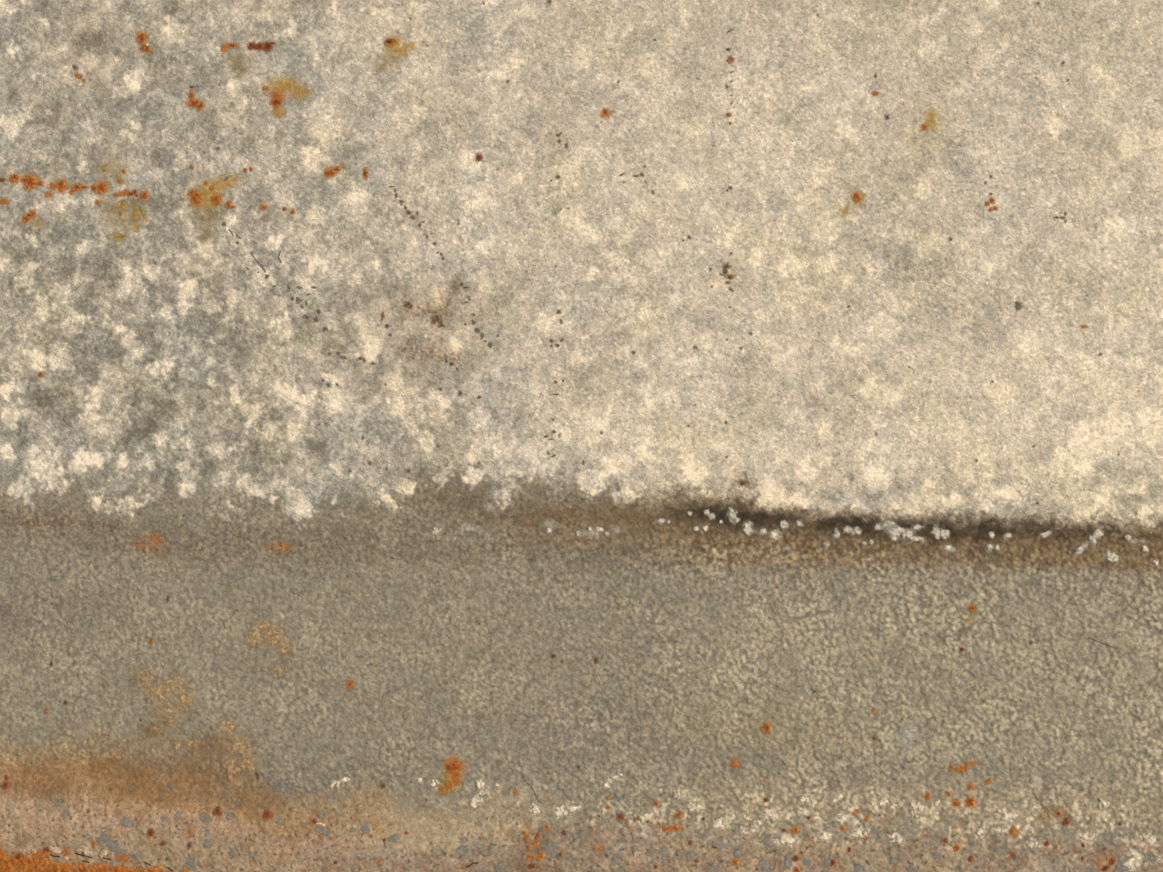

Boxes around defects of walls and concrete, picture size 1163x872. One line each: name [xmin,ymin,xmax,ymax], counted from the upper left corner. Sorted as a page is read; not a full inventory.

corrosion [221,41,275,71]
corrosion [263,80,308,118]
corrosion [0,164,149,240]
corrosion [180,167,253,232]
corrosion [0,844,191,872]
corrosion [417,757,464,795]
corrosion [522,802,581,869]
corrosion [603,770,659,824]
corrosion [740,793,813,872]
corrosion [817,792,889,852]
corrosion [905,761,992,816]
corrosion [1099,832,1163,871]